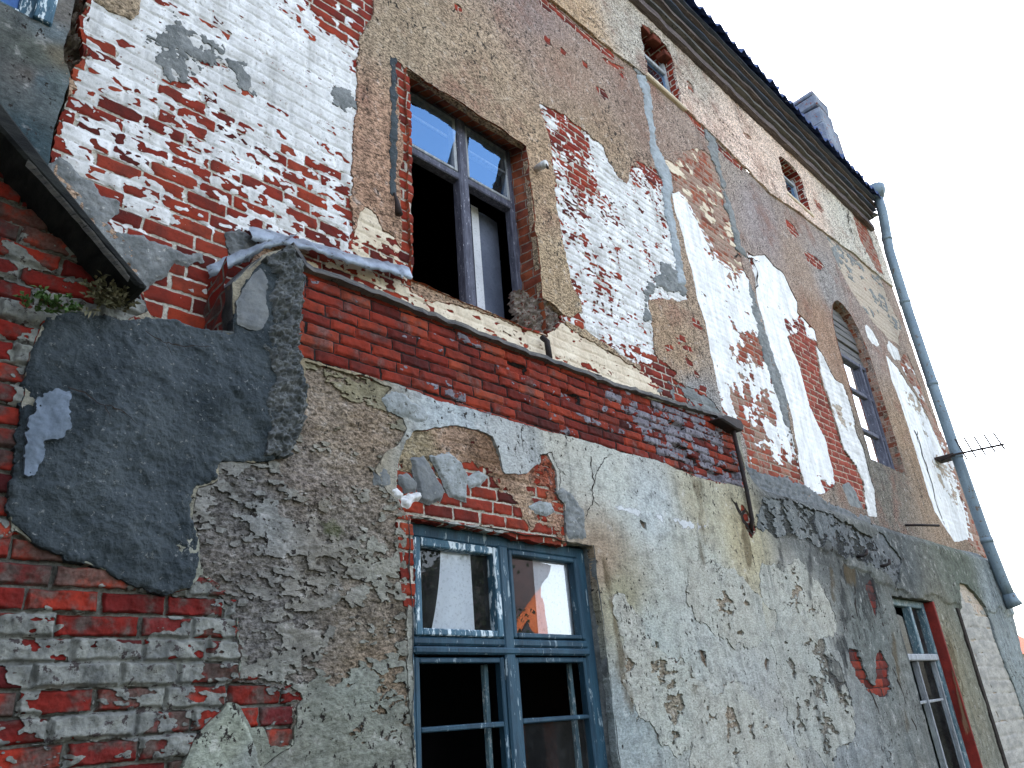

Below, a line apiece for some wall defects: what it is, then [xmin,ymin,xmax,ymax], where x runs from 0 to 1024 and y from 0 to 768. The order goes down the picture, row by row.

peeling [0,0,745,768]
peeling [302,104,877,517]
crack [585,454,612,519]
peeling [826,216,987,559]
peeling [611,557,890,768]